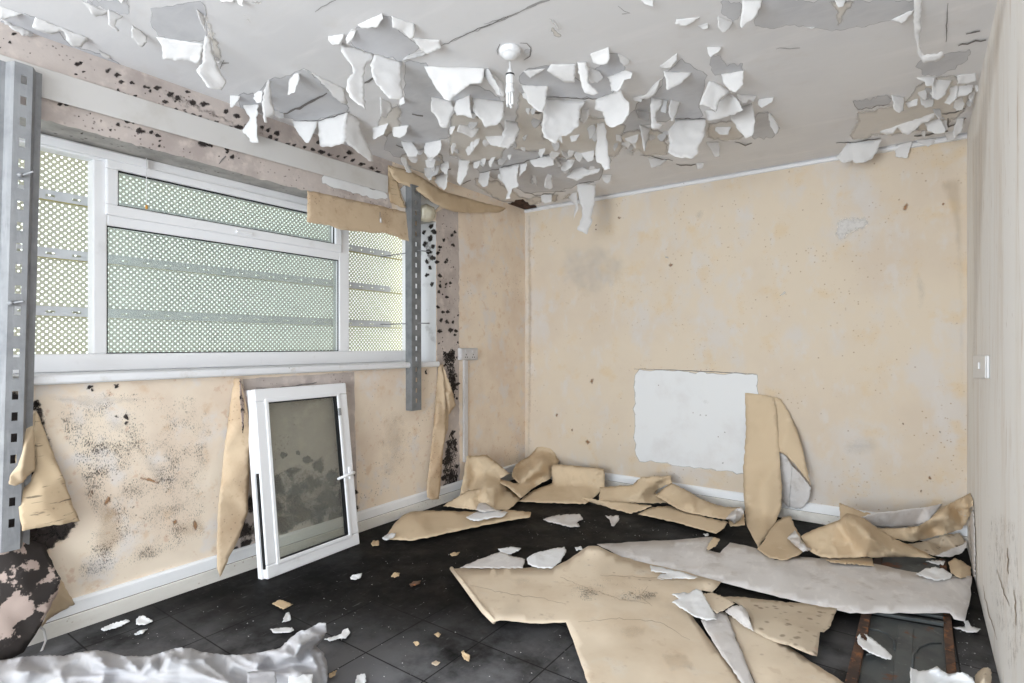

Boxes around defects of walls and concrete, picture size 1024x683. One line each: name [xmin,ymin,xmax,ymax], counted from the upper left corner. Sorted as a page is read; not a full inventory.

water stain [105,68,246,130]
water stain [260,126,381,173]
crack [444,0,550,45]
peeling [675,0,986,163]
flaking render [0,0,780,486]
water stain [422,215,460,400]
water stain [33,400,50,441]
water stain [30,522,76,550]
water stain [63,384,209,573]
flaking render [235,470,256,548]
flaking render [243,372,358,512]
flaking render [269,397,342,535]